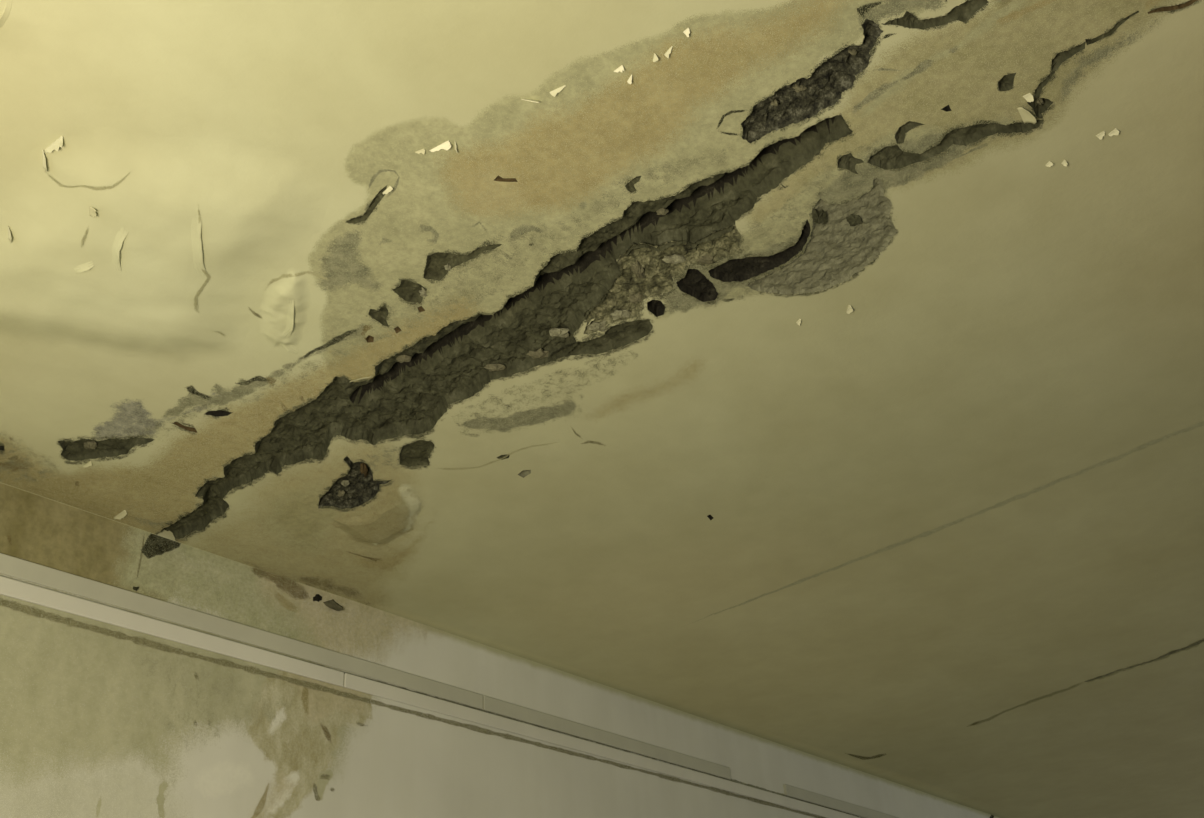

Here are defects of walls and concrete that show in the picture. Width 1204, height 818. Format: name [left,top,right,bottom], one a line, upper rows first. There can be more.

crack [1085,0,1202,45]
peeling [1096,128,1120,140]
damp [0,0,1182,648]
spalling [141,0,1086,559]
spalling [56,433,155,468]
crack [687,421,1204,625]
damp [0,573,381,818]
crack [967,638,1204,727]